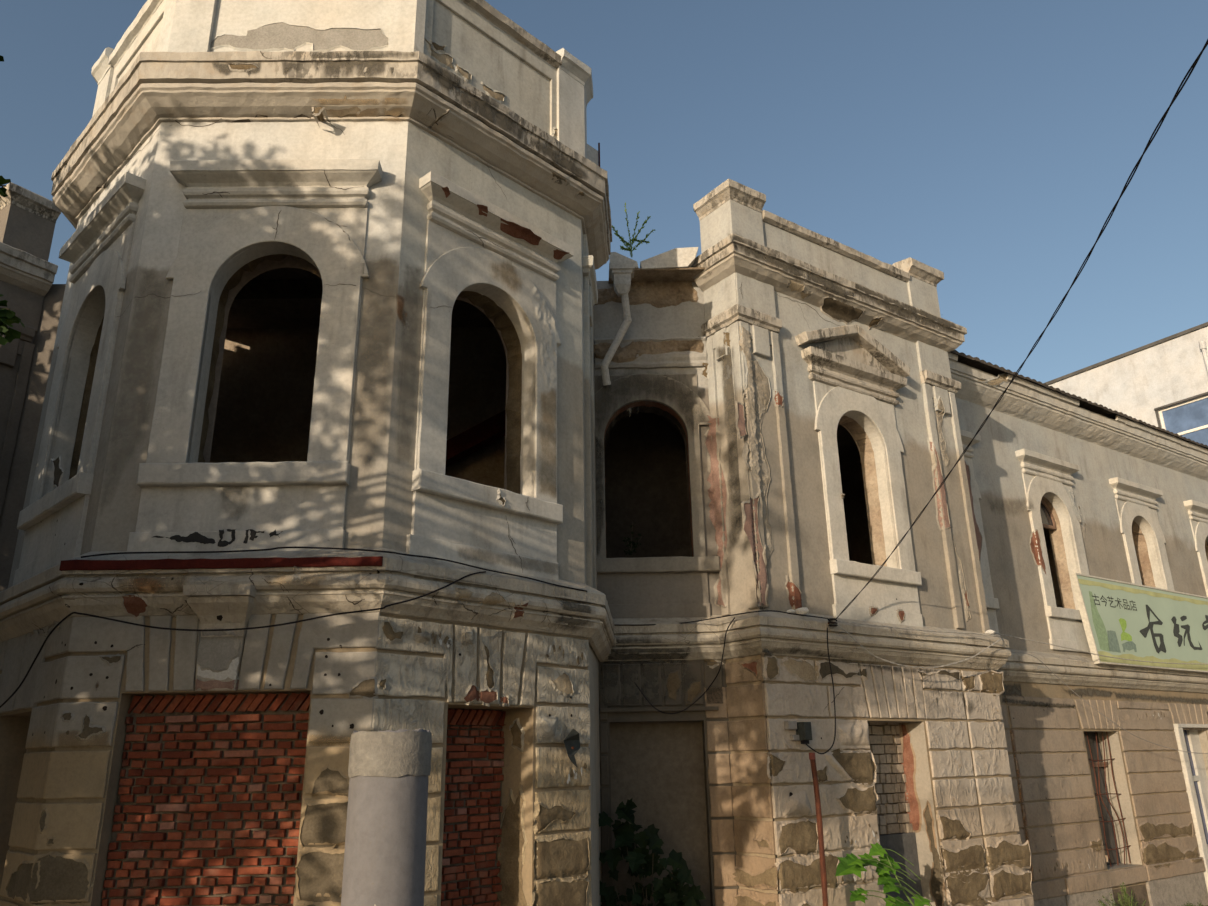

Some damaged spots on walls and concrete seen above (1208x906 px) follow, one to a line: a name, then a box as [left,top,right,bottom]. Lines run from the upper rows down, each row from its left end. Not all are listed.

peeling [210,21,389,72]
peeling [415,37,506,103]
flaking render [477,204,542,245]
flaking render [553,248,569,260]
spalling [787,280,883,330]
peeling [704,326,784,609]
flaking render [1029,529,1046,574]
flaking render [785,575,802,609]
peeling [195,627,244,692]
spalling [294,765,350,906]
flaking render [898,723,1033,906]
spalling [1136,821,1203,870]